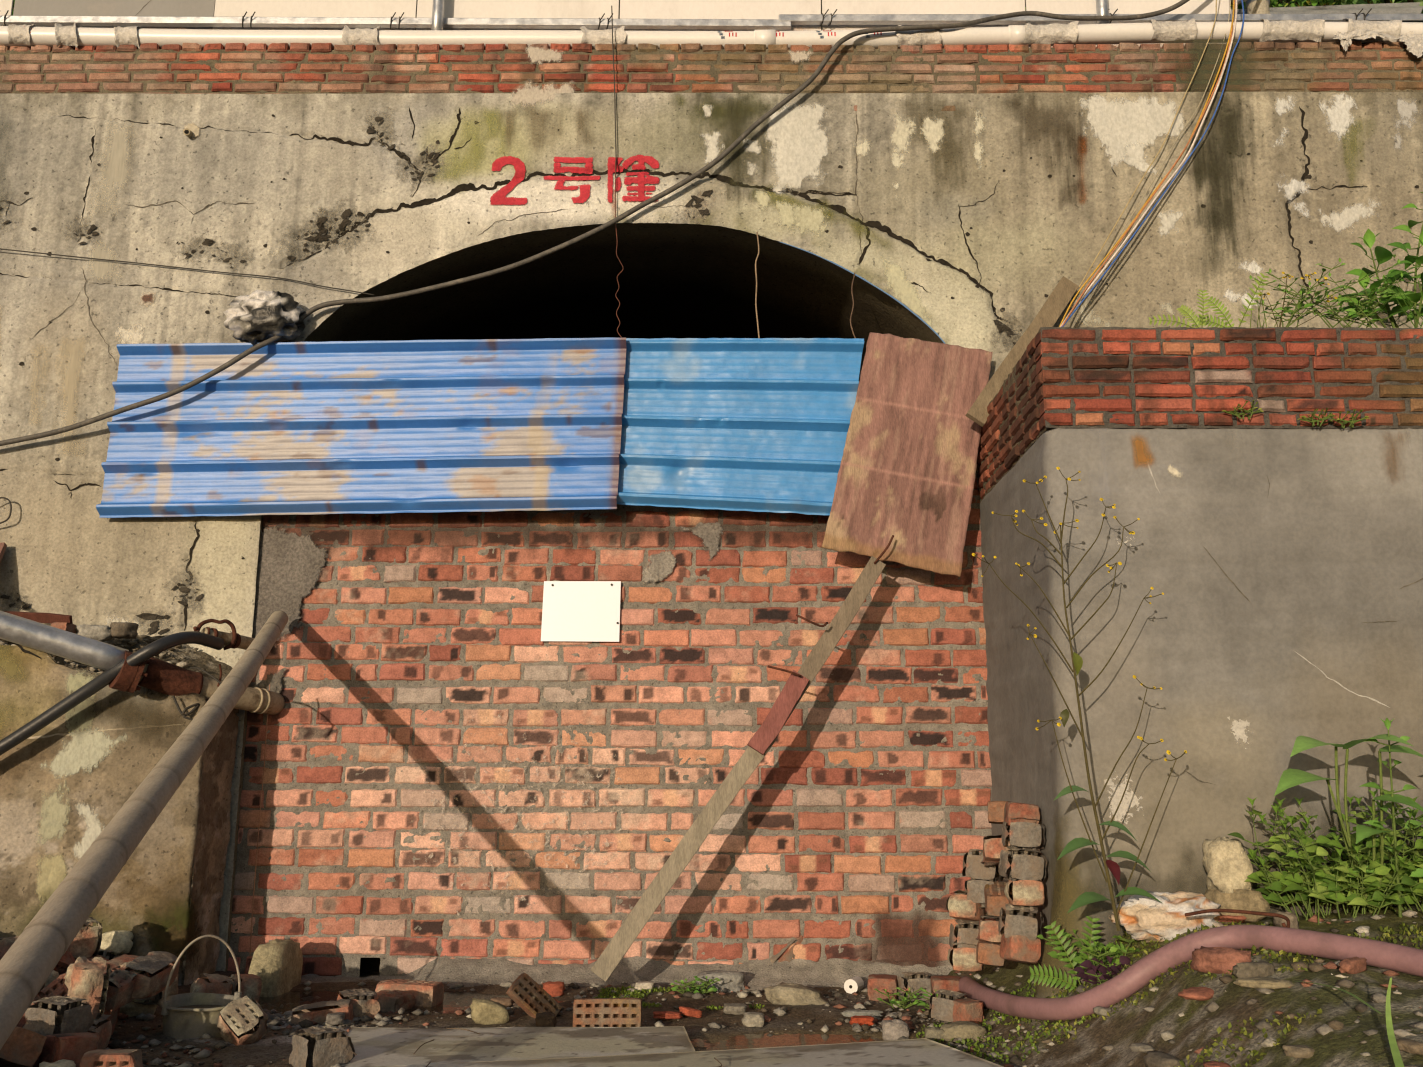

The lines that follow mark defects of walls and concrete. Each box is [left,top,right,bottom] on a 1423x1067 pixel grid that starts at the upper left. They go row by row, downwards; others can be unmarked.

peeling [702,132,725,163]
peeling [743,103,828,233]
peeling [1081,95,1184,174]
peeling [1275,96,1293,142]
peeling [1319,93,1355,140]
crack [279,107,1003,321]
peeling [1159,211,1182,235]
crack [1285,107,1364,312]
peeling [1278,179,1379,231]
peeling [883,260,932,326]
crack [177,522,200,631]